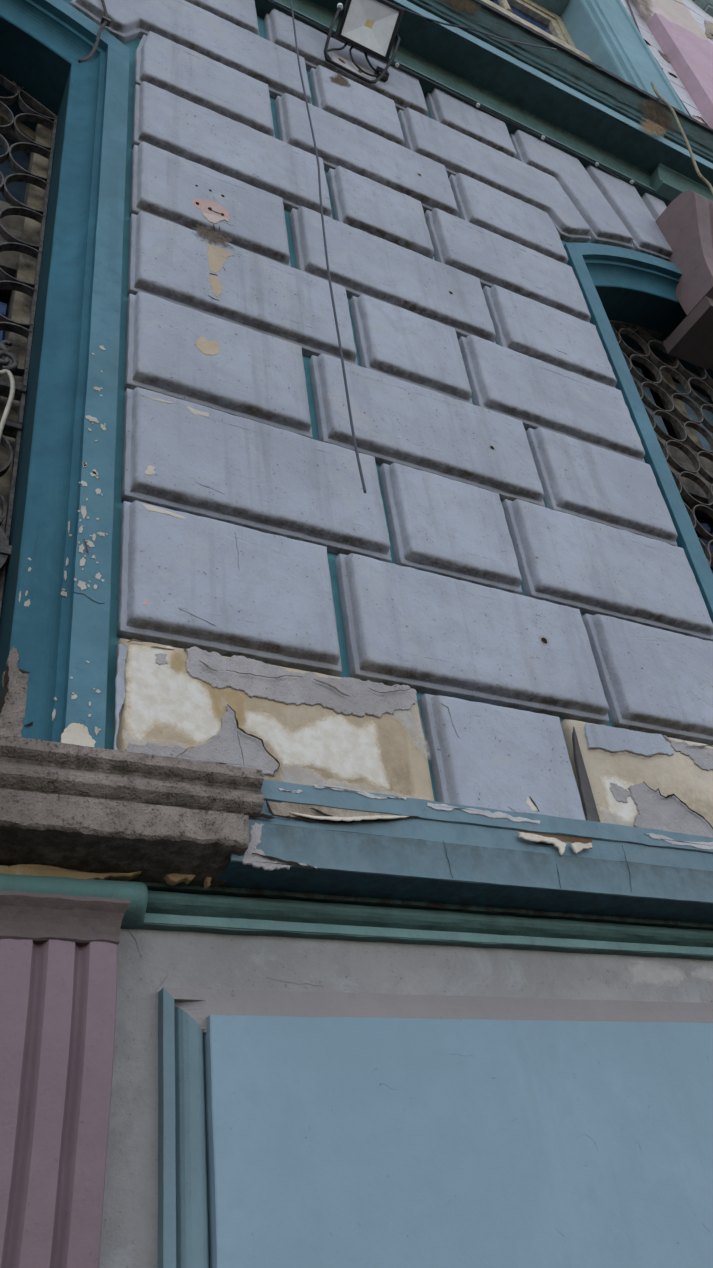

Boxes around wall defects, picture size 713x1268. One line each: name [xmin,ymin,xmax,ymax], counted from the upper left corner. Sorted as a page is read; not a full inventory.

water stain [270,0,340,33]
water stain [389,43,655,192]
peeling [205,243,235,300]
peeling [196,337,220,355]
peeling [85,415,107,442]
peeling [61,462,108,597]
spalling [0,647,33,737]
peeling [52,639,592,856]
peeling [572,723,713,850]